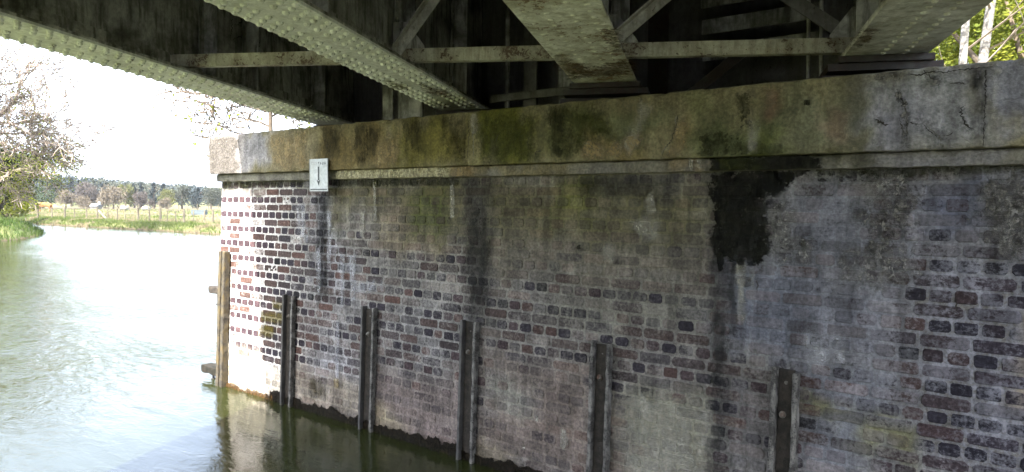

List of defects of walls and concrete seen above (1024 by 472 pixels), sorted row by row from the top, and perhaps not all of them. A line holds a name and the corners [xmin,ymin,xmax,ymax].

corrosion [557,29,635,79]
crack [875,66,998,147]
water stain [335,126,453,201]
water stain [707,142,822,303]